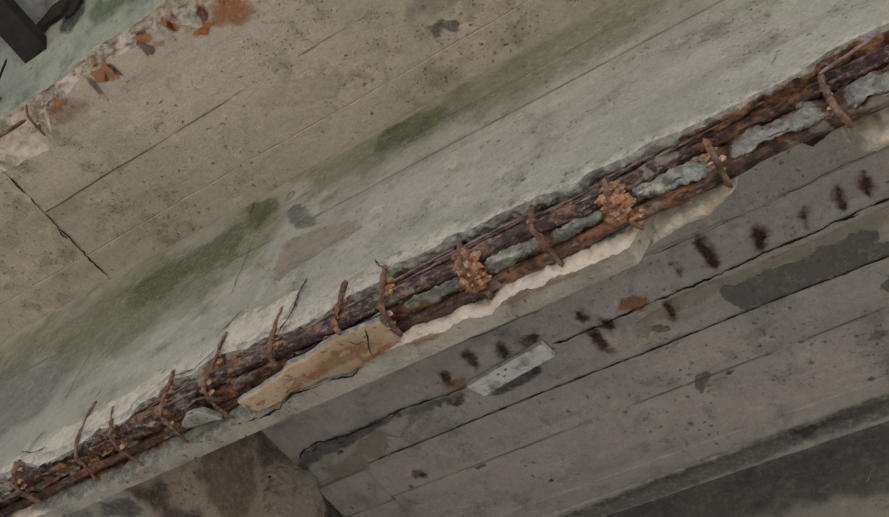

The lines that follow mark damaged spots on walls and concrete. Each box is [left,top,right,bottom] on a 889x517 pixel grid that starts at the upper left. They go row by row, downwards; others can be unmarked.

spalling [0,0,227,173]
crack [0,169,109,279]
rust [451,247,492,295]
rust [593,180,649,228]
spalling [383,23,889,322]
rust [693,236,719,268]
damp [719,230,889,310]
spalling [0,220,639,517]
crack [369,256,889,464]
damp [695,371,711,393]
crack [297,388,464,461]
damp [793,425,818,440]